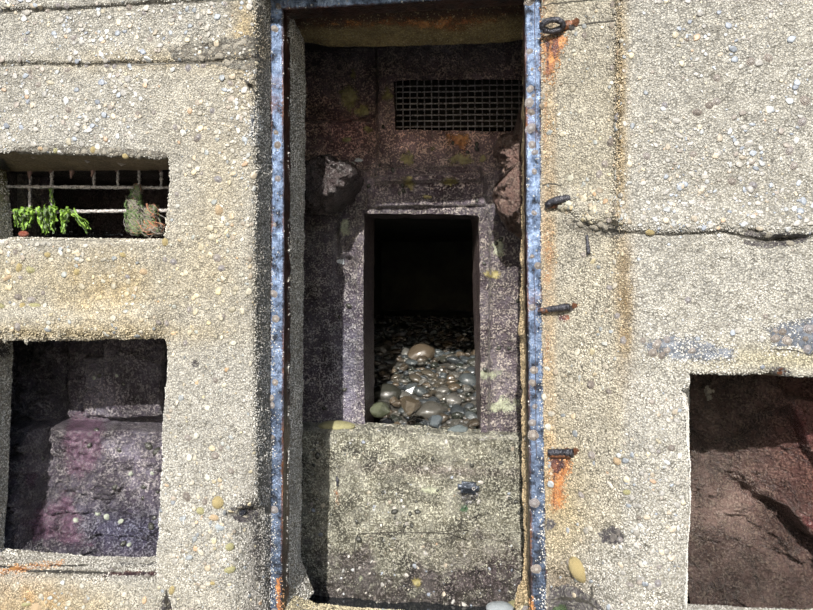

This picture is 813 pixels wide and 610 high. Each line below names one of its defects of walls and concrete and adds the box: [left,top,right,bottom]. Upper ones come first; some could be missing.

corrosion [542,18,580,83]
crack [573,220,813,243]
corrosion [549,447,579,510]
corrosion [0,563,62,574]